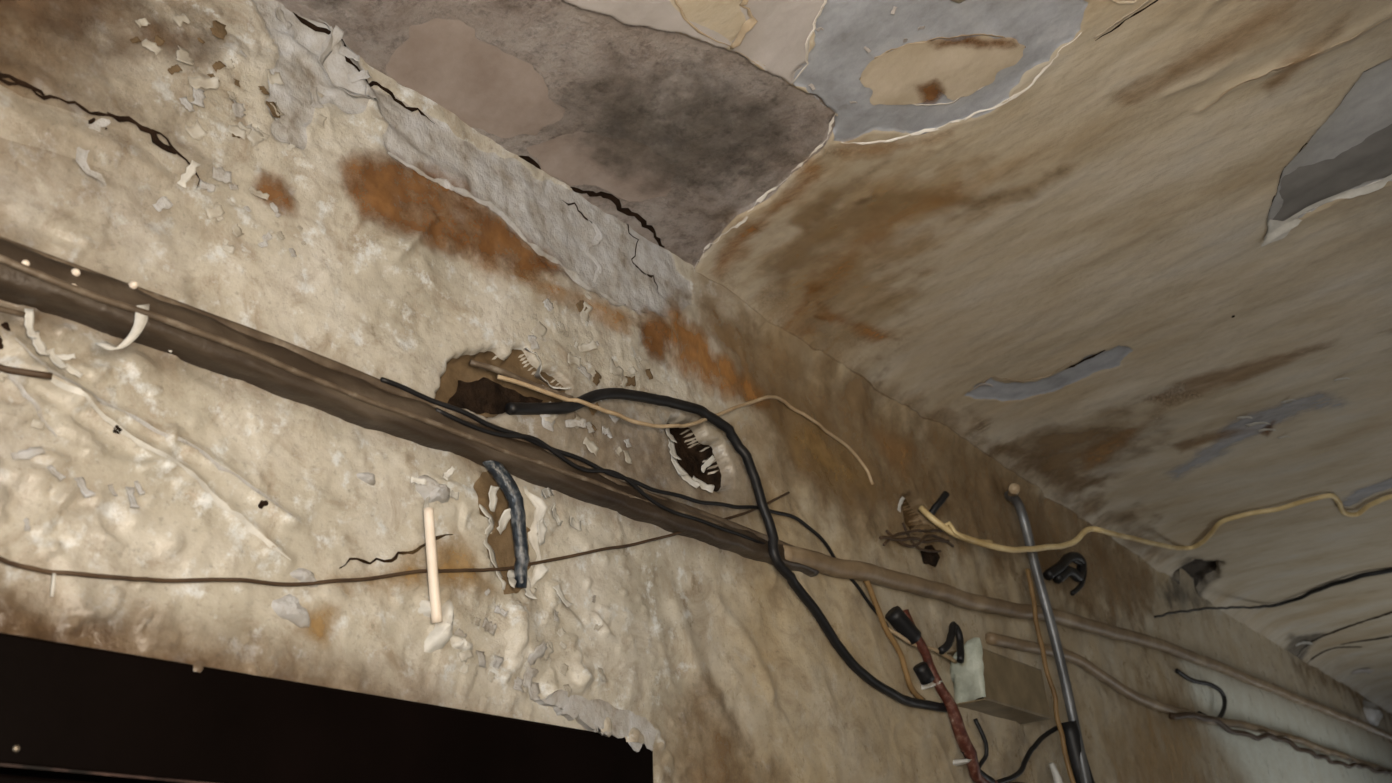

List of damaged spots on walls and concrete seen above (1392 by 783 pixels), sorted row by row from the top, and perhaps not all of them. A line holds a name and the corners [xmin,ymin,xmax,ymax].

crack [0,73,200,188]
rust [256,176,293,211]
spalling [130,0,1088,323]
spalling [1260,59,1392,247]
peeling [1,308,83,378]
spalling [435,298,653,464]
rust [343,156,766,404]
spalling [665,423,721,493]
water stain [704,300,1153,622]
peeling [965,345,1133,401]
peeling [454,471,657,752]
crack [1297,612,1392,663]